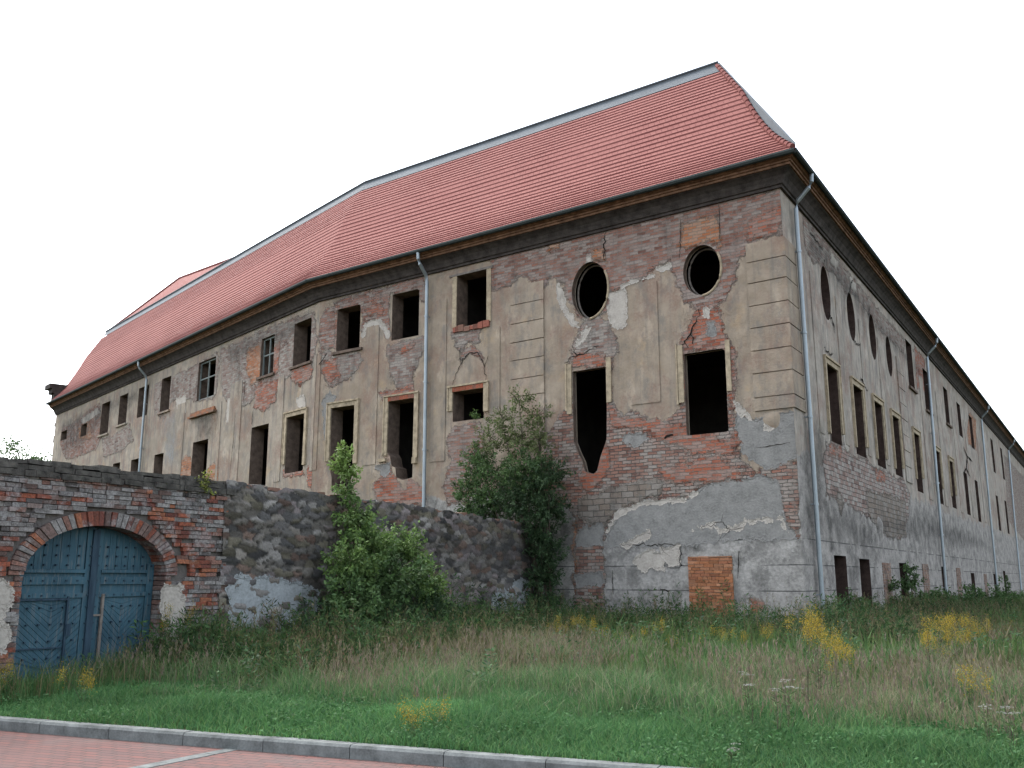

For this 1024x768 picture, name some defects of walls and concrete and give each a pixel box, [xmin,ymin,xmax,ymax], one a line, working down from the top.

flaking render [154,276,425,440]
flaking render [450,328,484,363]
crack [682,309,700,348]
flaking render [490,189,801,616]
flaking render [372,461,422,507]
flaking render [823,435,911,540]
flaking render [225,573,320,632]